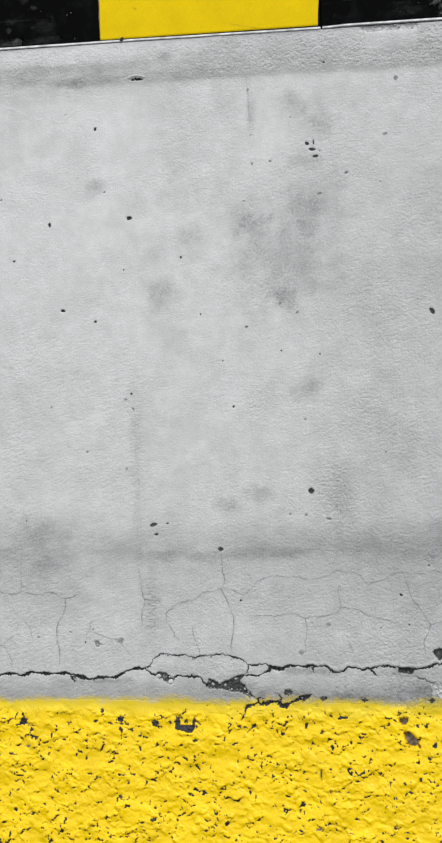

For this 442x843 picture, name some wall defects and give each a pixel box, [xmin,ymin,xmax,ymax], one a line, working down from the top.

crack [0,553,442,687]
crack [241,693,312,720]